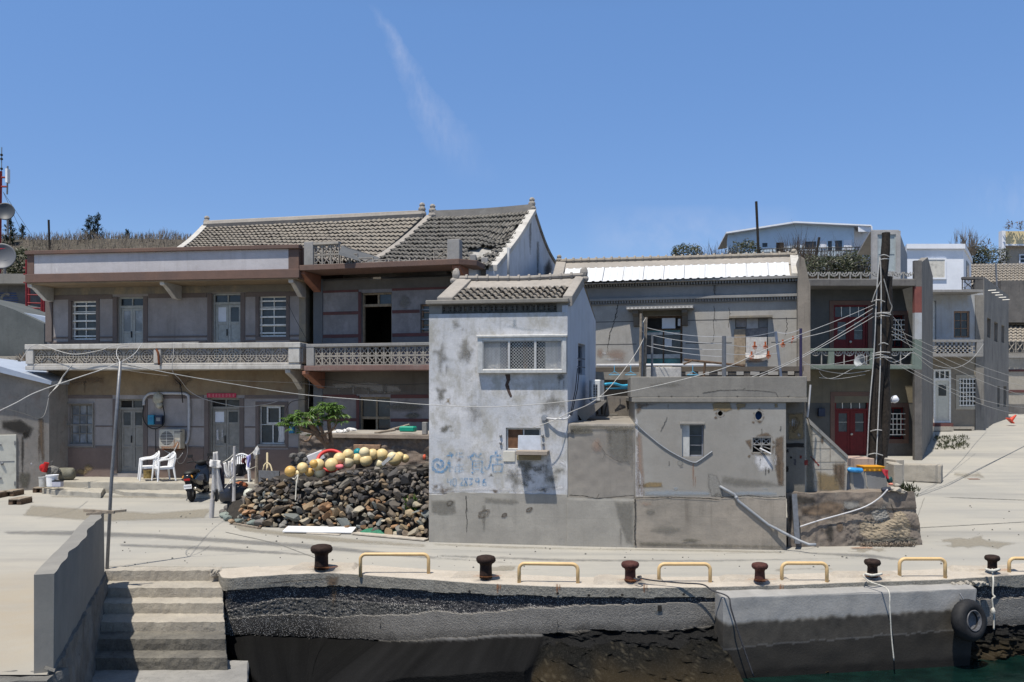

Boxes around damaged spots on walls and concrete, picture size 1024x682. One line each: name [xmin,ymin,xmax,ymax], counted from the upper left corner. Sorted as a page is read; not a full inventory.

spalling [802,501,844,532]
spalling [860,506,911,538]